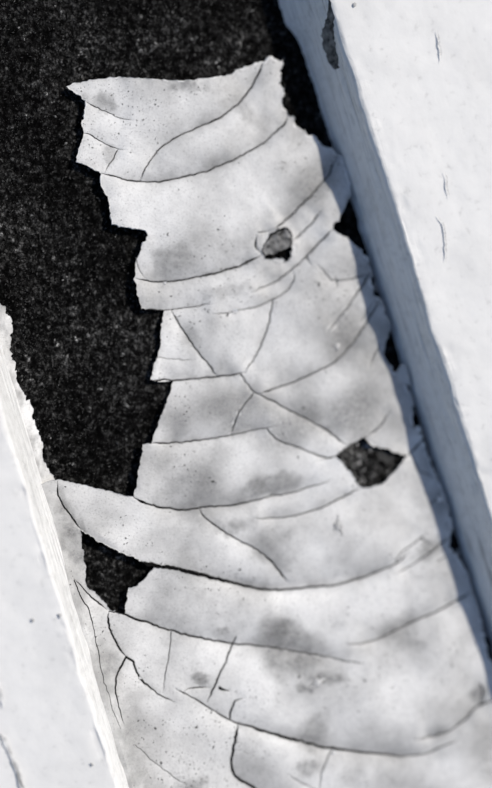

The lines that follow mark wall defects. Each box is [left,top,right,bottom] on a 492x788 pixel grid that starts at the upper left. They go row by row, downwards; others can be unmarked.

spalling [321,0,339,70]
peeling [67,56,288,182]
crack [81,64,287,183]
crack [136,157,380,462]
peeling [0,304,55,483]
crack [57,481,80,528]
peeling [41,115,492,788]
crack [133,480,450,591]
crack [407,440,437,480]
crack [74,579,492,788]
crack [0,734,25,788]